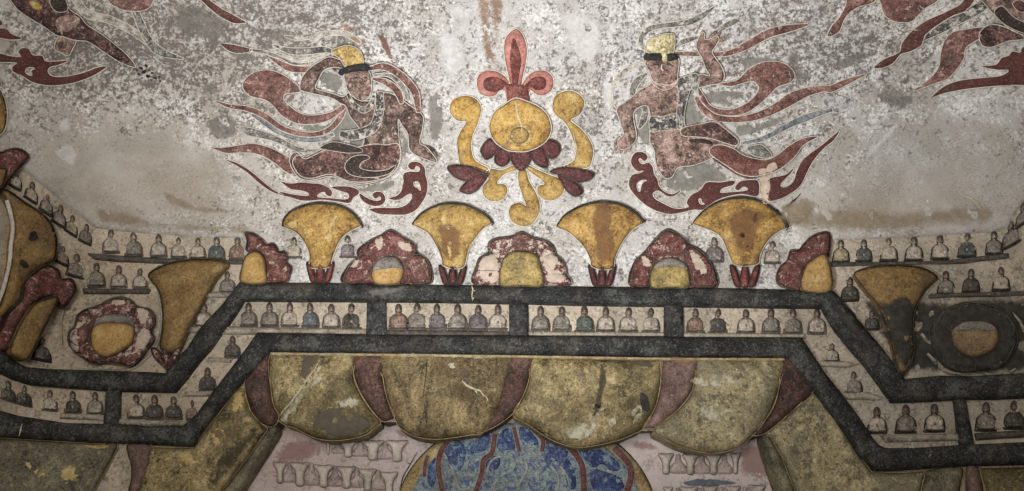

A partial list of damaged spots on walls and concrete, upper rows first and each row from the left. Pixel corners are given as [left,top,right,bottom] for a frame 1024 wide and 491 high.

damp [780,200,989,228]
peeling [478,249,500,284]
peeling [542,249,564,283]
peeling [689,250,707,274]
crack [462,380,488,401]